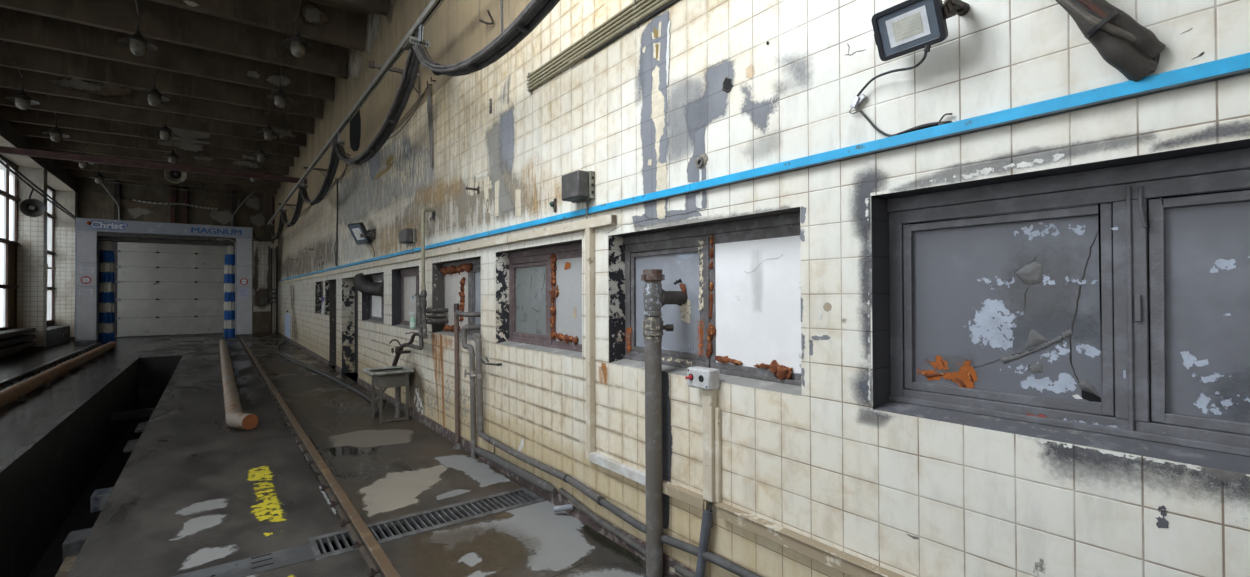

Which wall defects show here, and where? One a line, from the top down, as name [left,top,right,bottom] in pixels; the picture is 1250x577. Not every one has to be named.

peeling [642,20,670,191]
spalling [722,77,733,93]
peeling [315,280,370,373]
peeling [496,253,545,343]
peeling [609,237,625,363]
peeling [964,276,1024,350]
peeling [1043,275,1098,286]
corrosion [917,355,978,388]
peeling [999,341,1117,428]